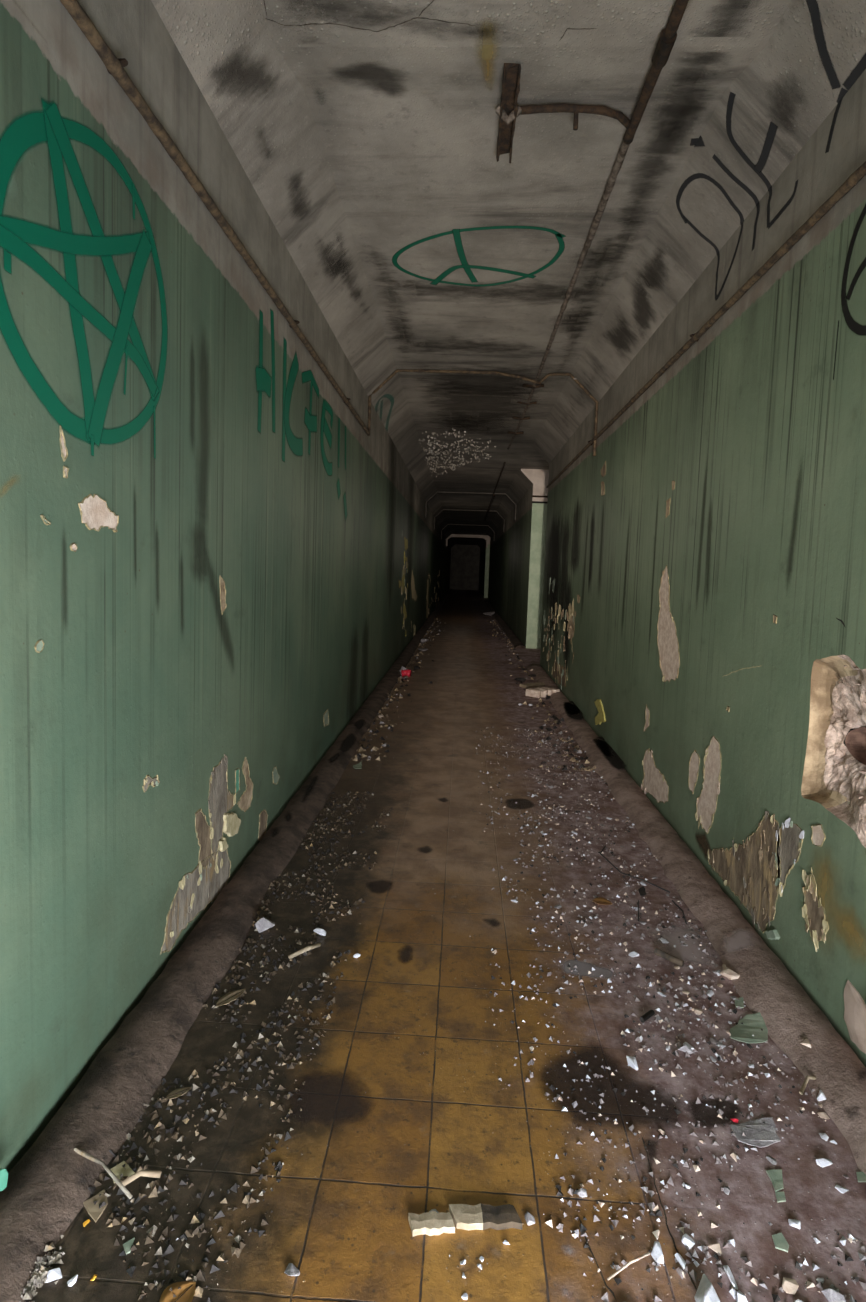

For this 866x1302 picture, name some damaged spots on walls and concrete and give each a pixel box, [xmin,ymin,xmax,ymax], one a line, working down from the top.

peeling [78,494,119,533]
peeling [543,577,580,690]
peeling [657,565,680,682]
peeling [160,754,268,955]
peeling [641,748,669,804]
spalling [689,655,866,952]
peeling [844,980,866,1054]